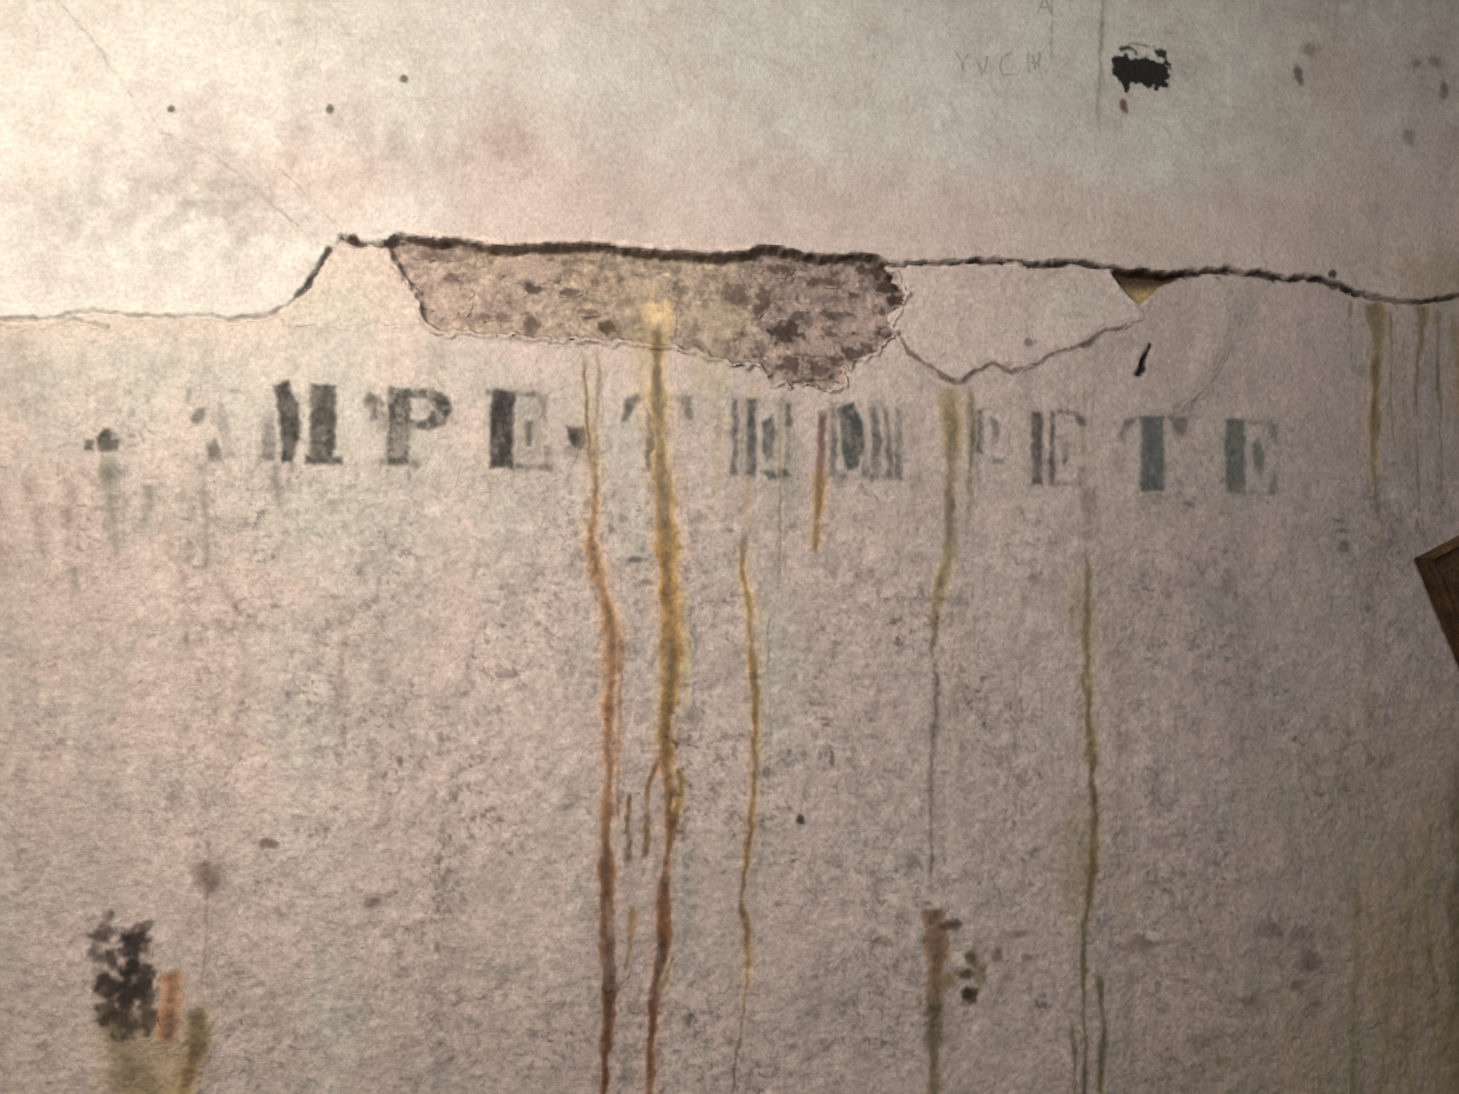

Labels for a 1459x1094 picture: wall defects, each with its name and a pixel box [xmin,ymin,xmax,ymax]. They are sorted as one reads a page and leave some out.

crack [0,0,398,333]
spalling [279,228,1188,392]
crack [771,244,1368,300]
rust [568,293,838,1094]
leakage [1080,621,1459,1094]